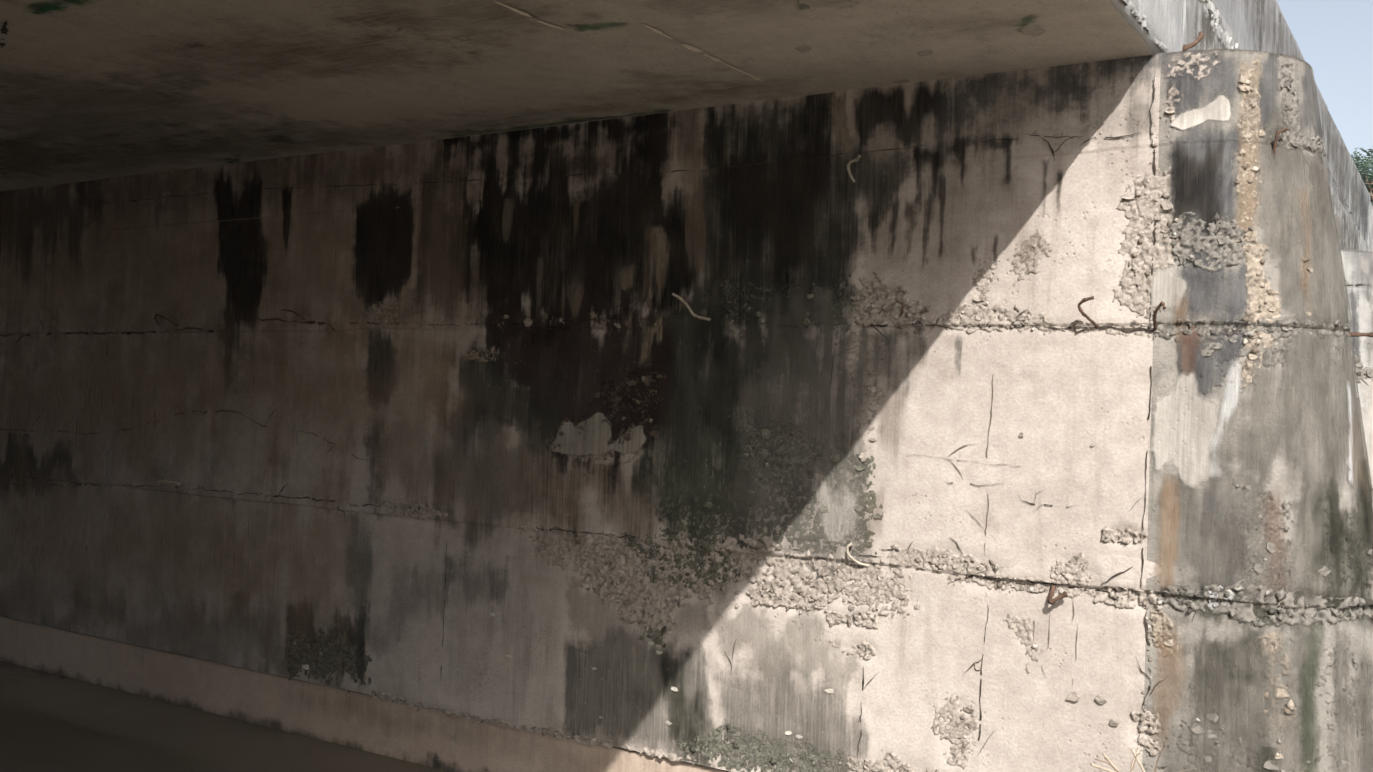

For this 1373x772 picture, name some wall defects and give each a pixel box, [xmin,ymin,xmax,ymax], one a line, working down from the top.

water stain [197,162,267,392]
water stain [282,189,292,249]
water stain [354,169,413,312]
water stain [367,331,395,403]
water stain [430,0,1373,772]
spalling [546,0,1373,772]
water stain [285,603,370,684]
spalling [285,627,979,772]